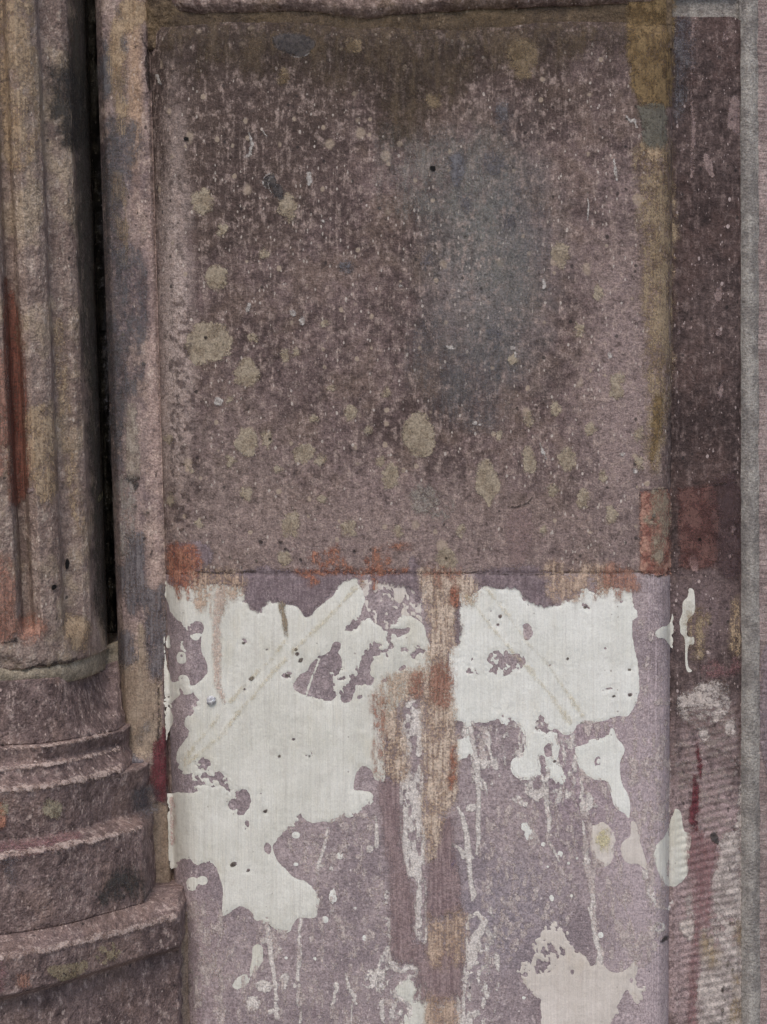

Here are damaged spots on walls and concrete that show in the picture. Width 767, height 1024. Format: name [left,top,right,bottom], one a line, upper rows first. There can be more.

rust [166,542,245,702]
rust [544,561,640,601]
peeling [164,570,431,944]
rust [295,544,478,861]
peeling [447,586,735,887]
peeling [395,979,428,1024]
rust [427,909,468,967]
peeling [517,921,647,1024]